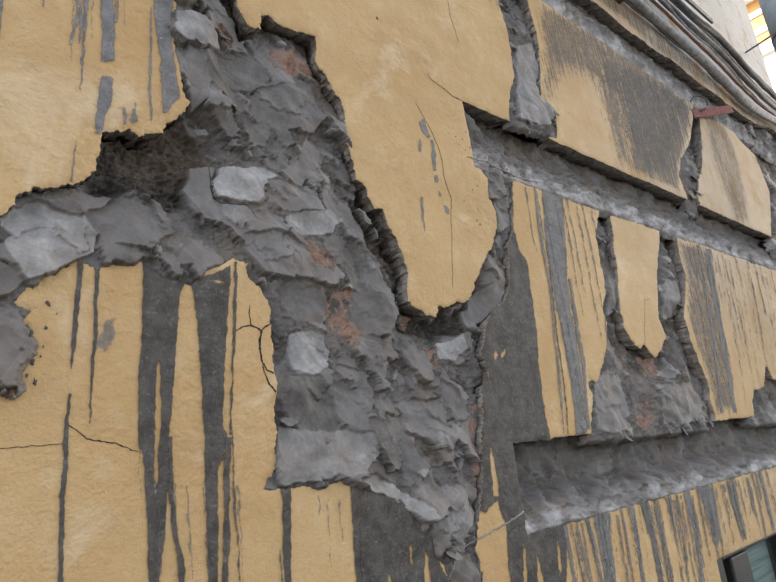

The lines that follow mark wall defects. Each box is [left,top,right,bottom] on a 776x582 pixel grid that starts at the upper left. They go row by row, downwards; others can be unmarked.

spalling [675,139,703,221]
spalling [736,122,776,264]
water stain [58,394,71,582]
water stain [70,260,84,368]
water stain [89,268,115,423]
crack [69,425,138,452]
water stain [138,262,243,582]
crack [232,305,276,393]
spalling [0,0,512,582]
water stain [279,487,292,582]
water stain [525,186,608,435]
water stain [479,229,776,582]